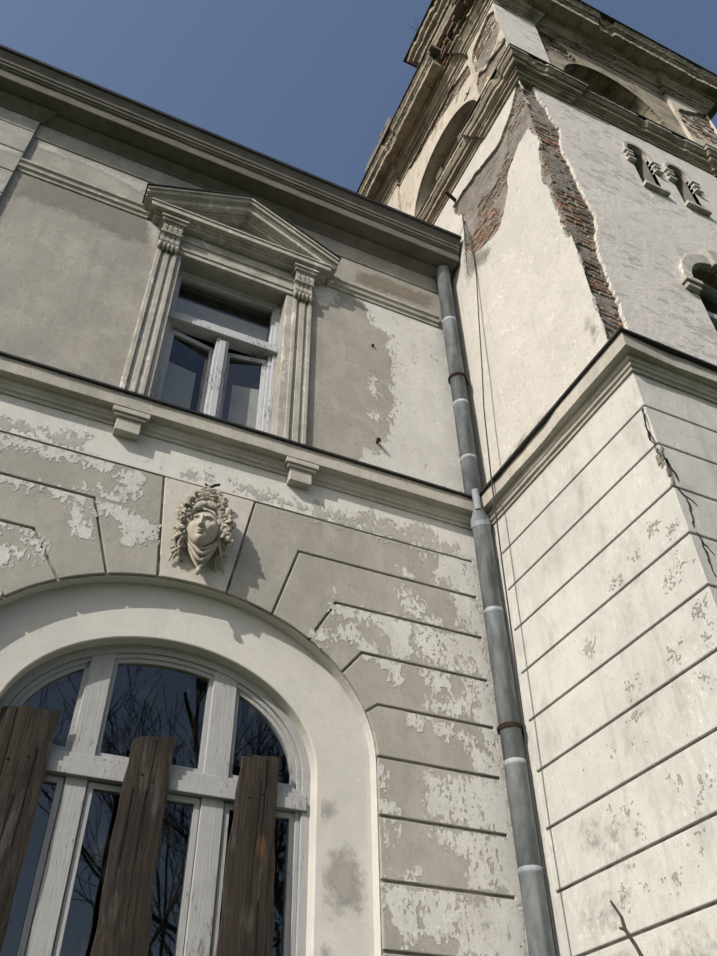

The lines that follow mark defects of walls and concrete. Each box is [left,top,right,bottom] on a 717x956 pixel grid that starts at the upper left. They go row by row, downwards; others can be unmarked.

flaking render [412,13,506,167]
flaking render [679,111,717,144]
peeling [313,285,464,493]
peeling [0,516,51,569]
peeling [0,413,162,548]
peeling [179,467,215,484]
crack [642,408,716,576]
peeling [228,477,529,956]